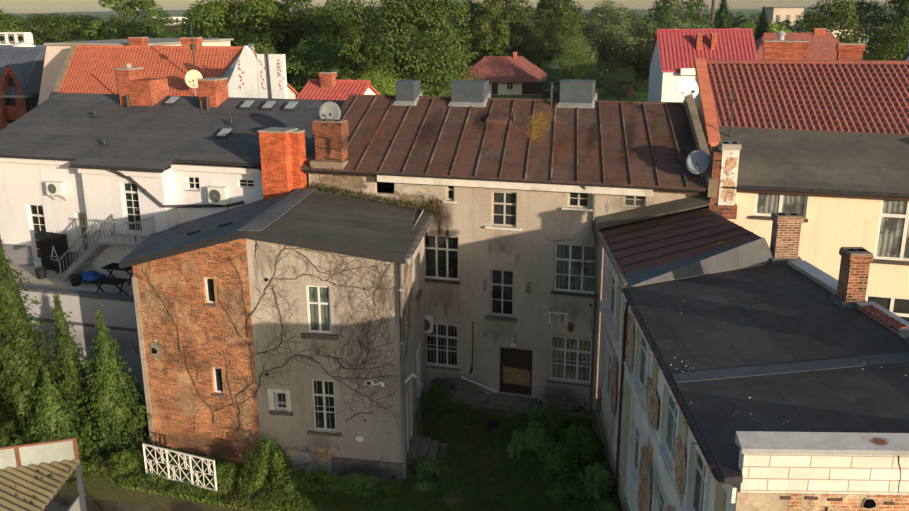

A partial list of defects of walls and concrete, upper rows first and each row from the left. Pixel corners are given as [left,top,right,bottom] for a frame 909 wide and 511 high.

peeling [720,153,738,202]
peeling [645,375,659,430]
flaking render [281,446,340,470]